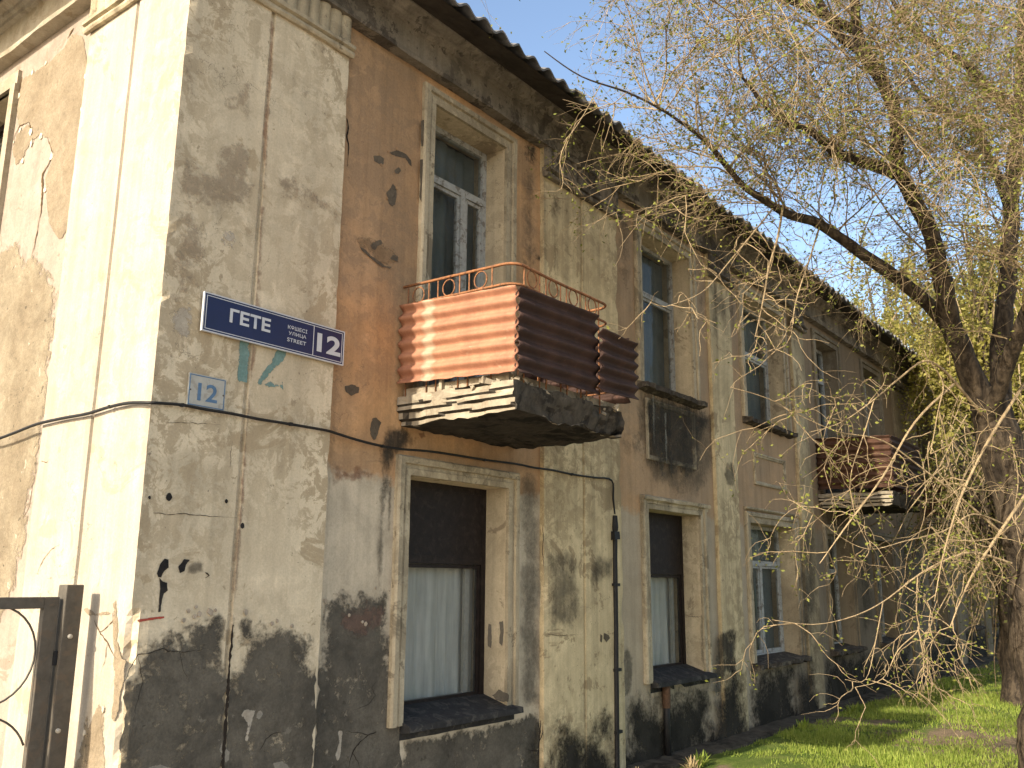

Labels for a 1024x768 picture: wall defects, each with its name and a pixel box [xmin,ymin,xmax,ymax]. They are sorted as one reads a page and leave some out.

spalling [12,34,87,239]
spalling [373,148,423,206]
spalling [0,242,56,615]
leakage [641,396,711,484]
crack [94,613,234,768]
spalling [75,586,540,768]
leakage [702,630,736,693]